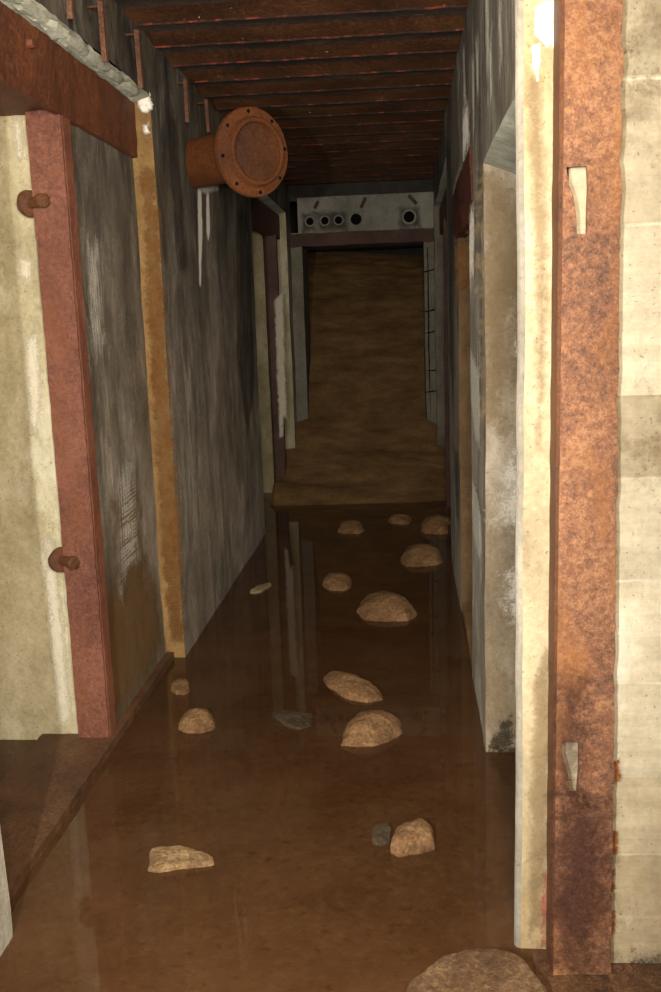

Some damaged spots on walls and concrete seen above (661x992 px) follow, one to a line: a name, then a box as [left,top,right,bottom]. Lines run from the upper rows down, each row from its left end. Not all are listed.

leakage [532,1,554,81]
leakage [489,440,516,529]
leakage [488,715,516,753]